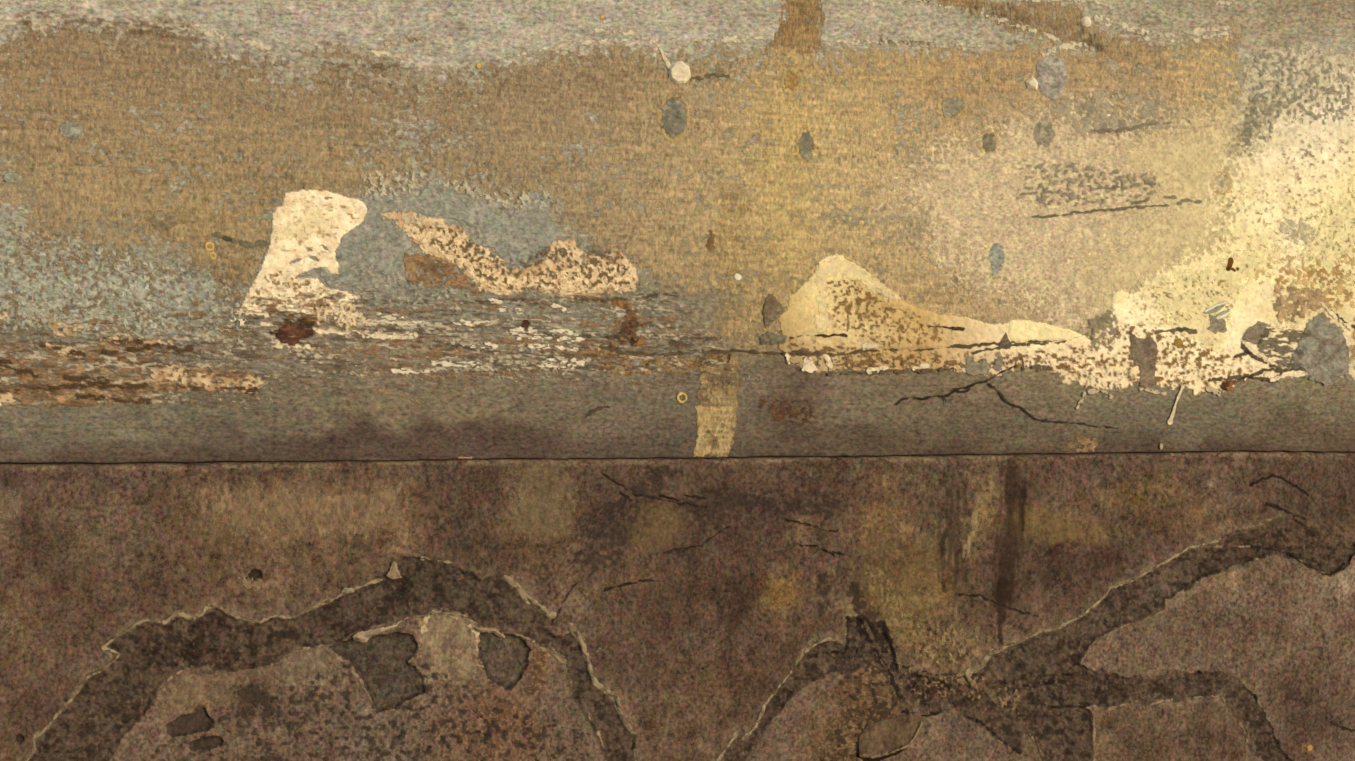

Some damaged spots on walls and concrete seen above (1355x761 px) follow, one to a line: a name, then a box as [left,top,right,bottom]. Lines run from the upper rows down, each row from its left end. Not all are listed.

damp [205,232,232,259]
rust [270,313,321,345]
peeling [0,169,638,408]
damp [0,288,756,458]
peeling [760,254,1158,387]
crack [895,358,1118,429]
peeling [1203,301,1231,334]
peeling [1209,303,1355,386]
damp [996,469,1104,643]
flaking render [16,556,639,761]
flaking render [716,514,1355,761]